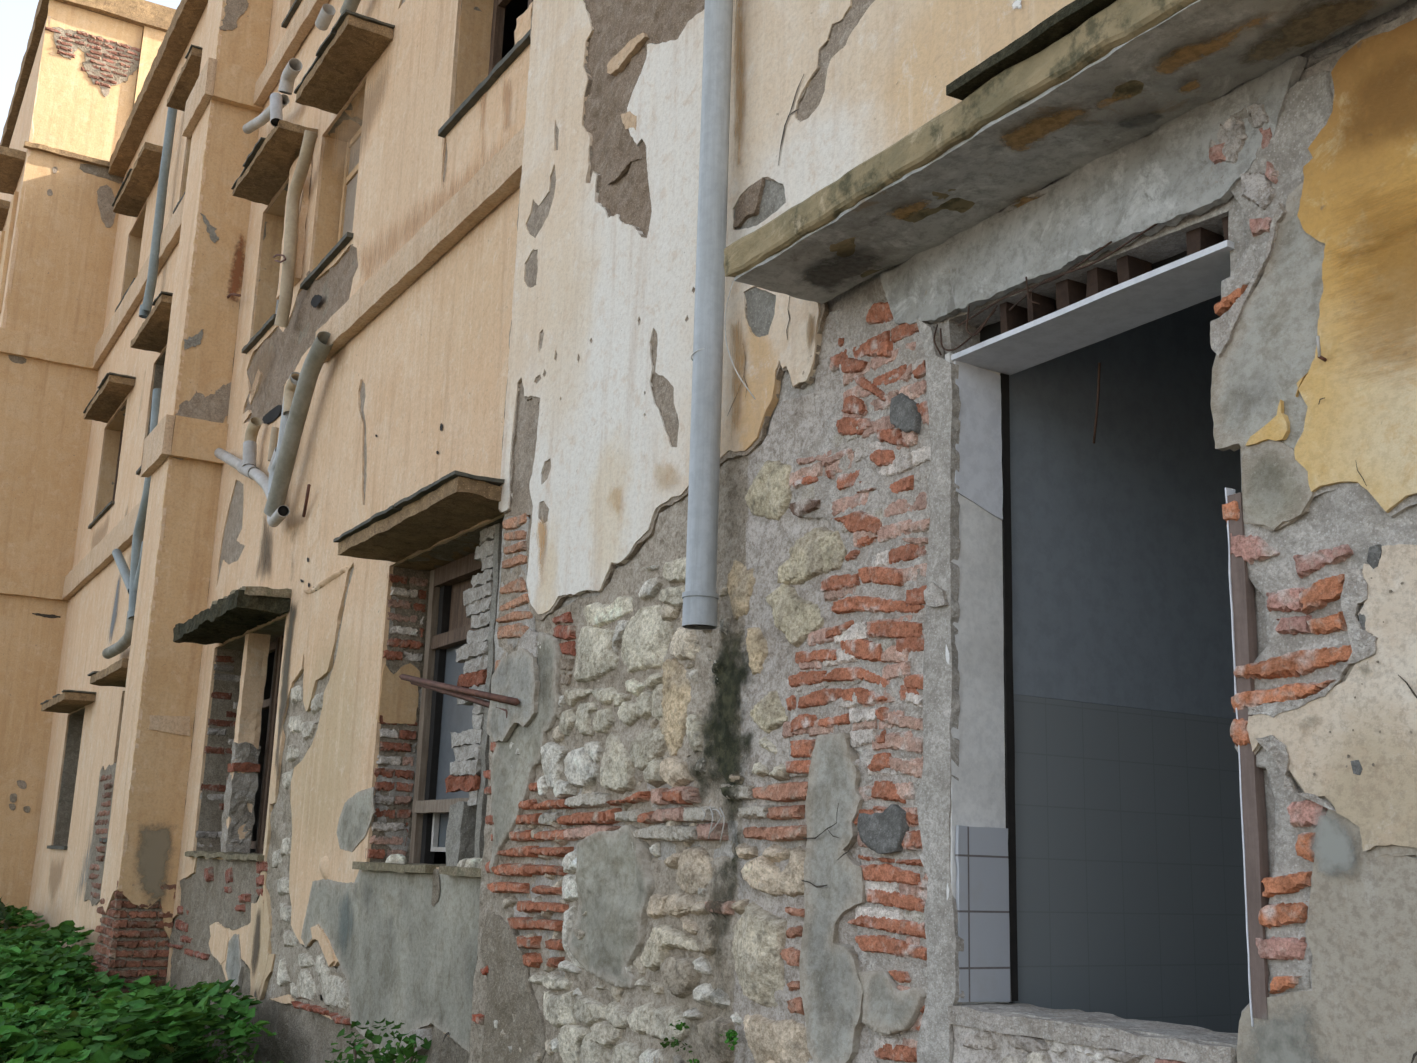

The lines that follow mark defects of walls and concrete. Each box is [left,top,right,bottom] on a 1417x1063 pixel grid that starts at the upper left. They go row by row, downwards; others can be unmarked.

flaking render [45,26,141,97]
peeling [219,0,249,31]
peeling [175,244,358,448]
peeling [584,0,705,238]
peeling [745,287,776,337]
peeling [797,0,875,122]
flaking render [1206,70,1333,357]
peeling [218,481,245,579]
peeling [84,566,360,1063]
flaking render [381,314,949,1063]
damp [691,631,751,935]
flaking render [1222,482,1417,994]